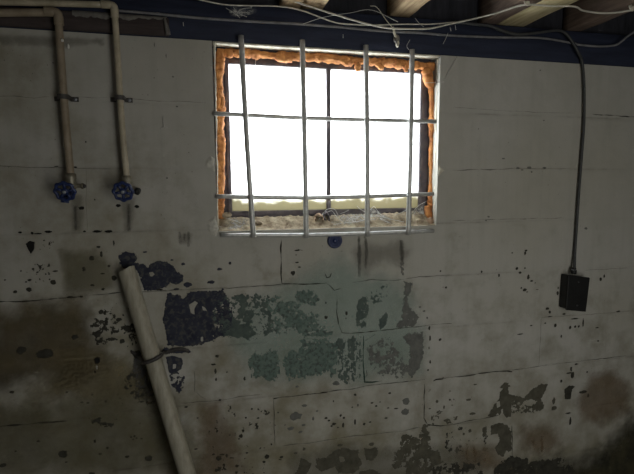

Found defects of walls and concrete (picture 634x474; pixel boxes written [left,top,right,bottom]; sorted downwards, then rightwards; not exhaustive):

peeling [90,302,142,358]
peeling [118,251,431,393]
leakage [0,305,175,470]
peeling [560,363,589,399]
peeling [392,399,483,474]
peeling [476,382,575,474]
leakage [554,424,634,474]